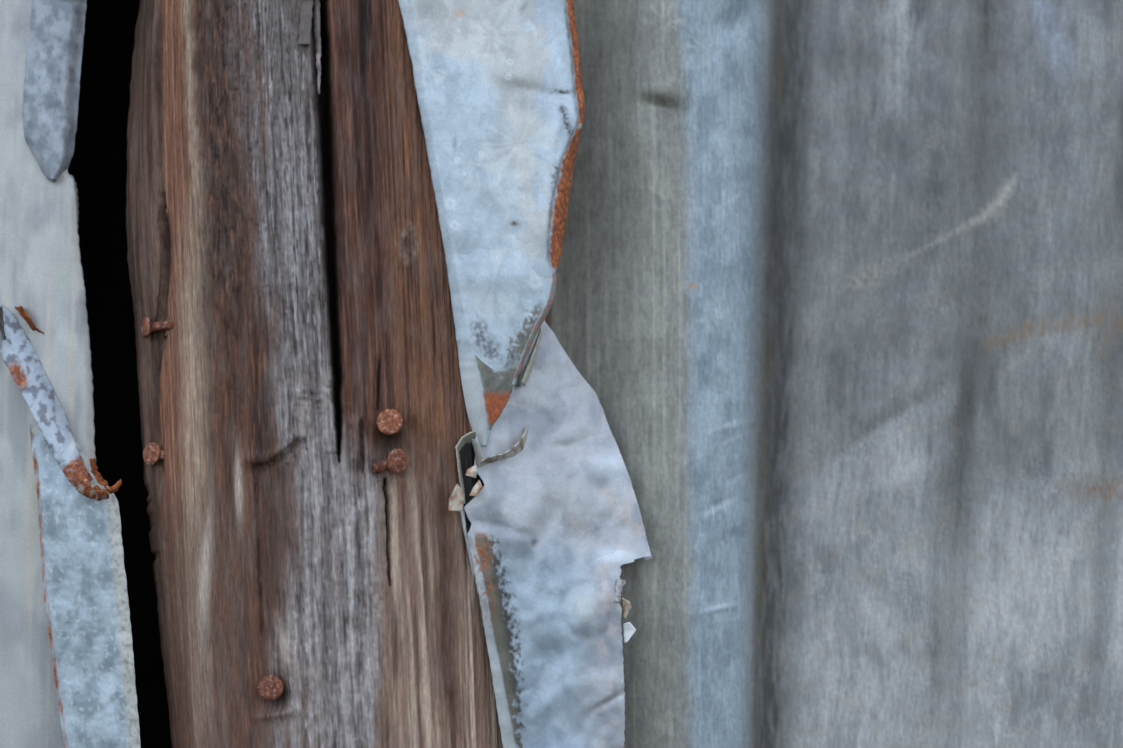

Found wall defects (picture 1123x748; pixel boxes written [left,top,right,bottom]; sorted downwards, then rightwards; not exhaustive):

crack [309,0,393,588]
peeling [464,297,548,392]
rust [480,0,585,430]
rust [61,454,92,488]
peeling [484,531,529,748]